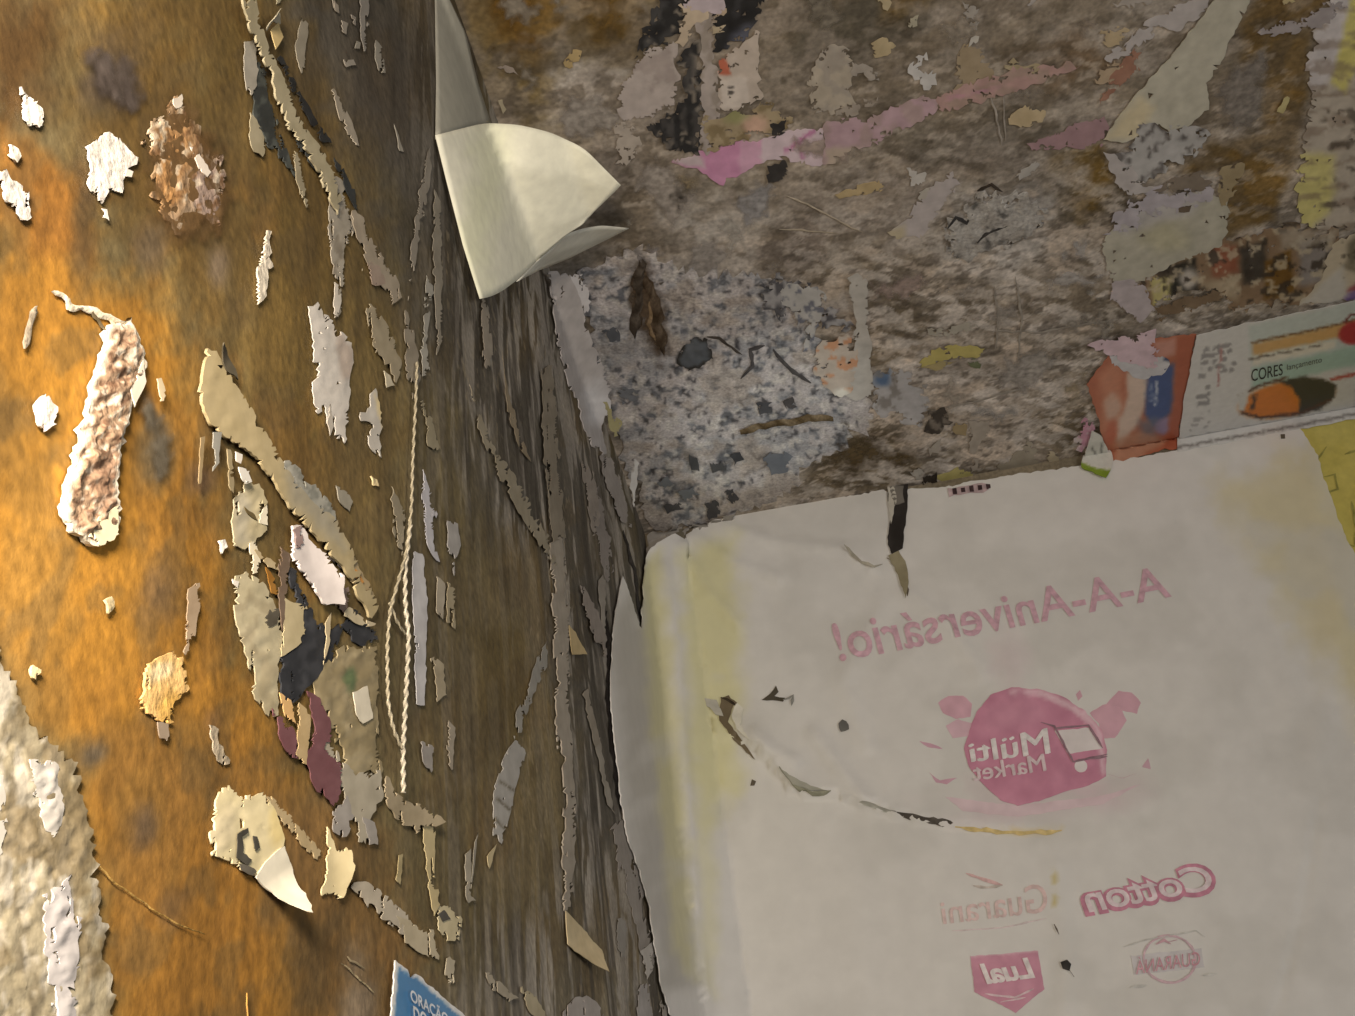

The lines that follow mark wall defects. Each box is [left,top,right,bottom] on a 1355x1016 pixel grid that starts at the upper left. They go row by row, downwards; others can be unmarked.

peeling [19,86,44,128]
peeling [0,144,32,221]
corrosion [152,106,227,240]
peeling [33,394,58,432]
spalling [57,317,166,547]
peeling [235,452,252,484]
peeling [103,596,115,614]
spalling [0,649,116,1016]